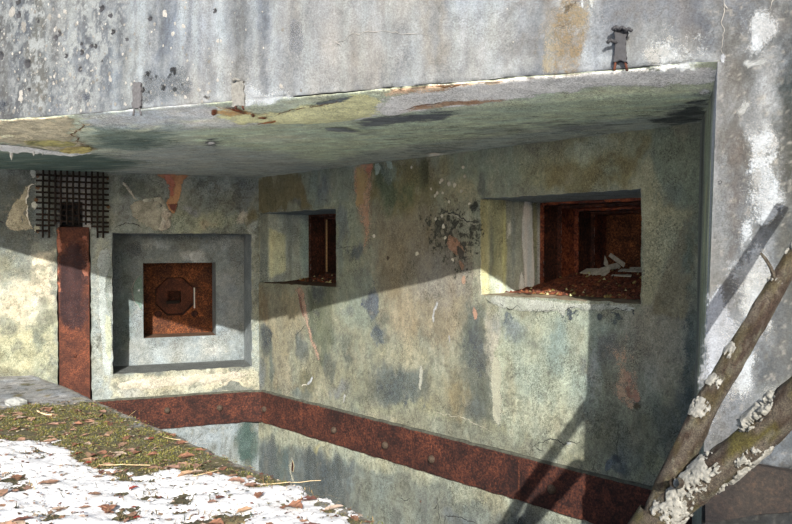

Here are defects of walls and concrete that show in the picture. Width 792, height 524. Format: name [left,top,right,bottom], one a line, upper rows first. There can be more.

damp [744,9,778,68]
rust [211,108,275,125]
damp [0,138,91,160]
spalling [6,184,34,232]
spalling [130,197,172,231]
peeling [435,214,466,284]